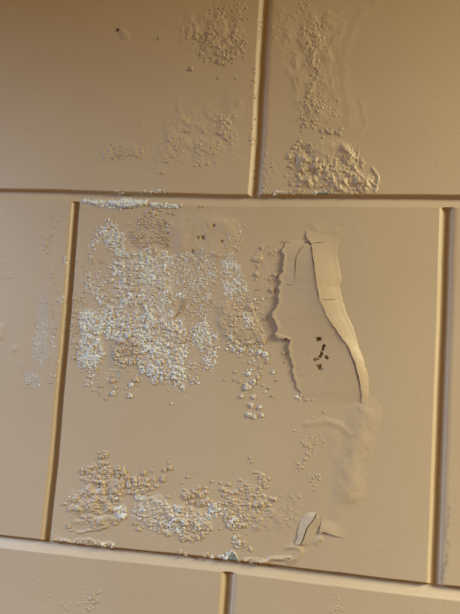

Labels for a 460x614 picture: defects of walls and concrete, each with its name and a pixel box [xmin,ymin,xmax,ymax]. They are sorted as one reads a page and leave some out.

efflorescence [69,197,279,419]
peeling [272,230,369,413]
peeling [202,512,347,565]